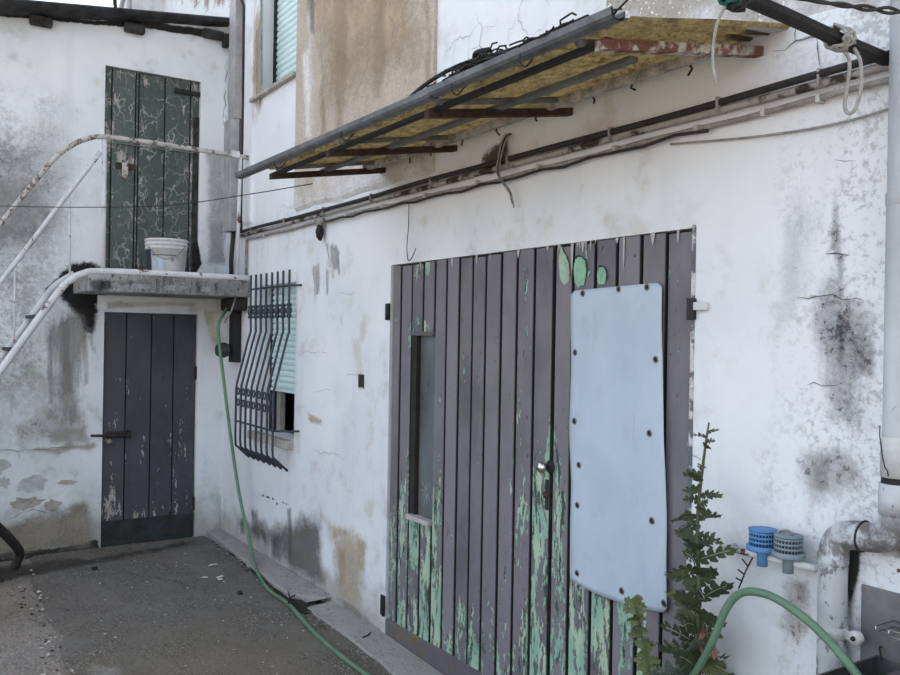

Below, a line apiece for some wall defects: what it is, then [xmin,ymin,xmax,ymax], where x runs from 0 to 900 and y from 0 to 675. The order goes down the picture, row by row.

water stain [303,44,314,138]
water stain [308,0,410,95]
crack [442,2,548,72]
water stain [21,262,114,439]
water stain [815,286,871,375]
flaking render [0,459,78,512]
water stain [240,513,321,584]
water stain [274,589,312,614]
water stain [333,534,367,622]